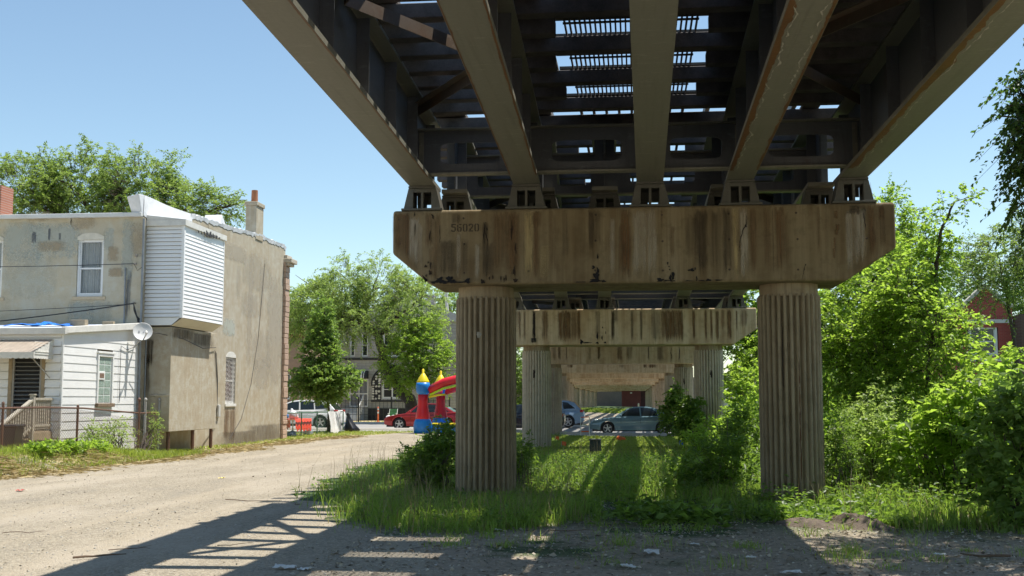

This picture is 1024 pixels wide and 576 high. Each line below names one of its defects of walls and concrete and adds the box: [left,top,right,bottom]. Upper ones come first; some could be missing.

rust [730,0,797,171]
rust [849,0,1006,168]
spalling [422,262,518,284]